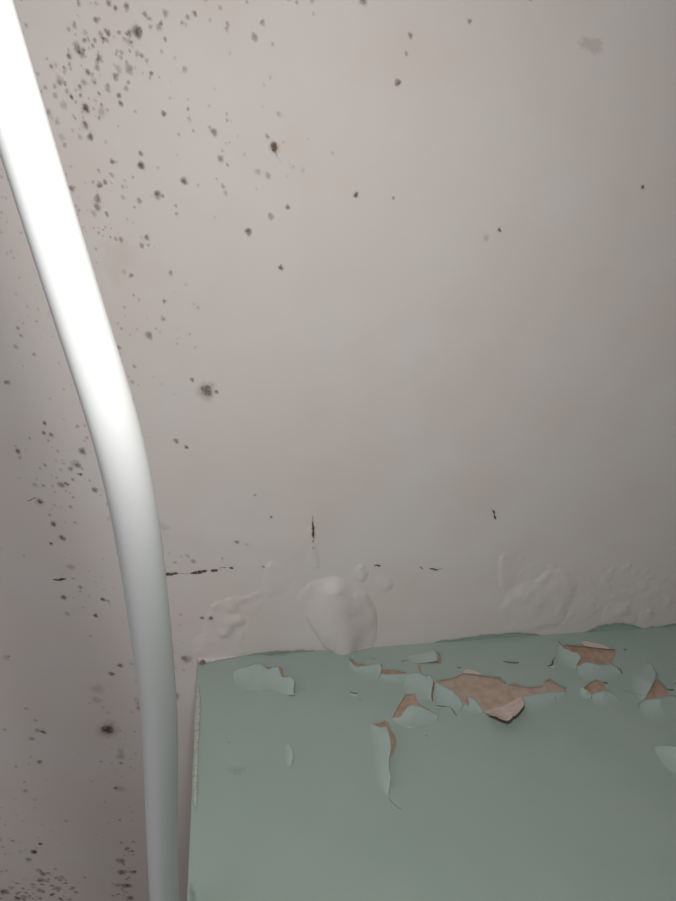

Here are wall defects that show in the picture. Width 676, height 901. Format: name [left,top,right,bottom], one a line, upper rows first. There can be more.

peeling [233,663,295,695]
peeling [348,641,676,796]